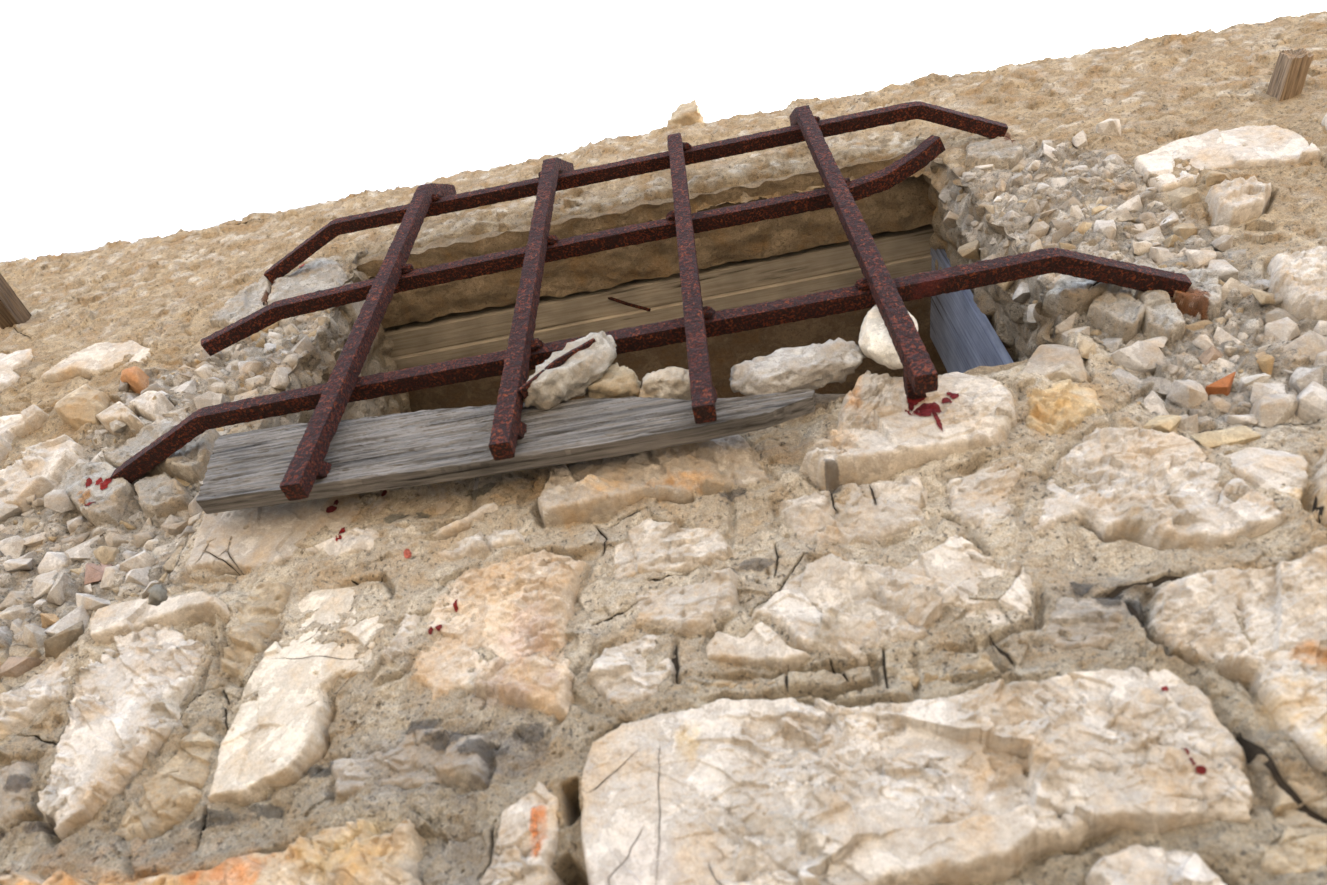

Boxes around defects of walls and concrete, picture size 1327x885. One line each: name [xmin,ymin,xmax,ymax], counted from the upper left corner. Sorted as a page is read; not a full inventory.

corrosion [1173,288,1209,321]
crack [180,689,230,729]